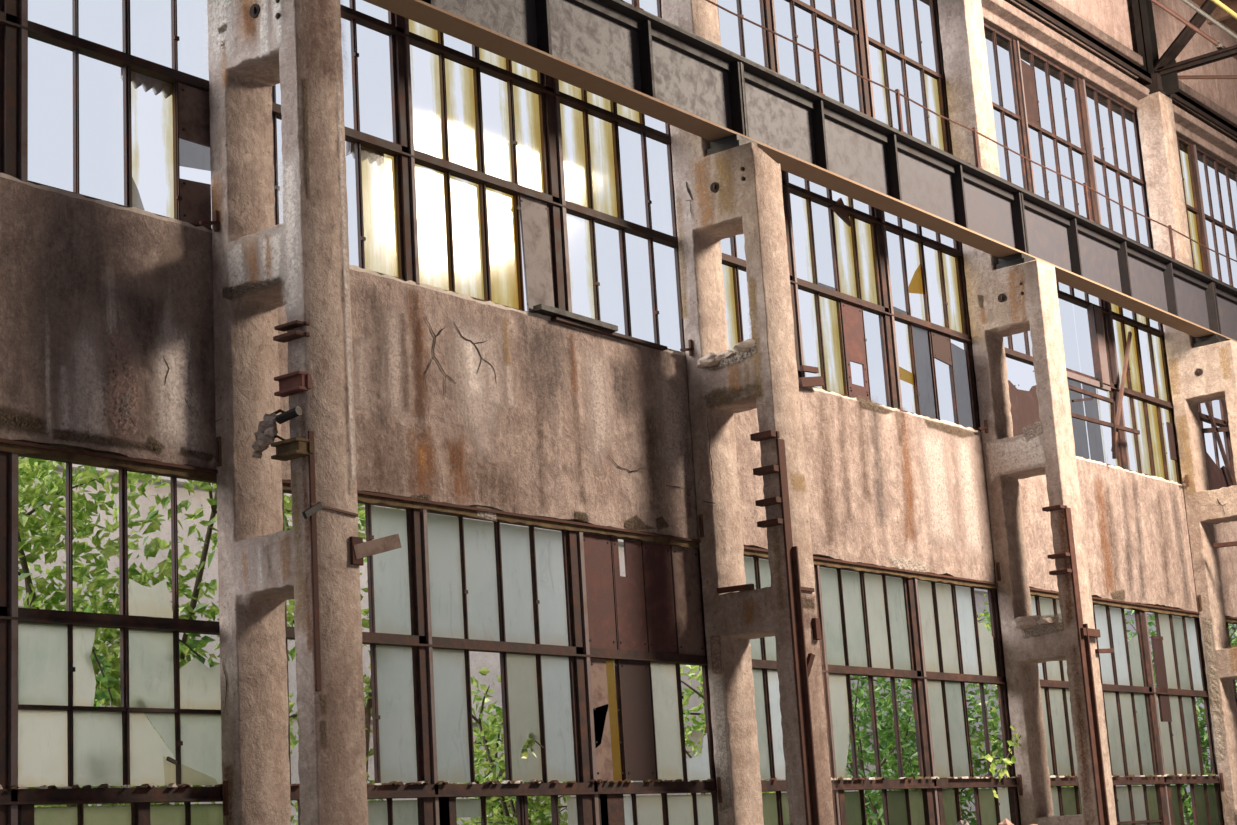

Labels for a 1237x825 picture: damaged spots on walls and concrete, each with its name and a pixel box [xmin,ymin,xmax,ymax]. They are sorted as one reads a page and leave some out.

damp [4,234,207,451]
spalling [223,276,282,299]
spalling [703,345,757,370]
rust [728,279,761,398]